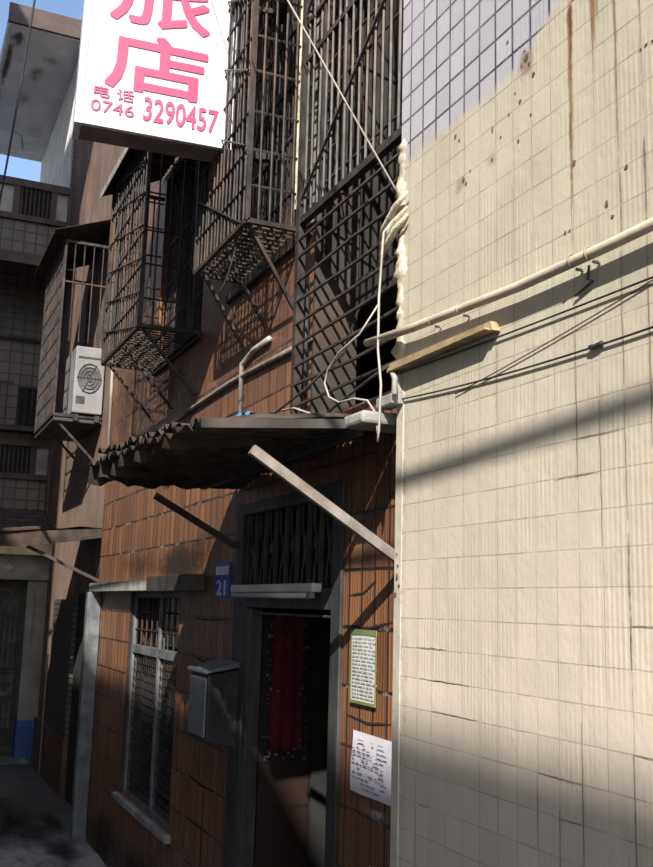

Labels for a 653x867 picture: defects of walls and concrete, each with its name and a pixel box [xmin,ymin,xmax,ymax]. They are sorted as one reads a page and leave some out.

crack [630,625,651,670]
crack [537,763,584,844]
crack [633,755,653,867]